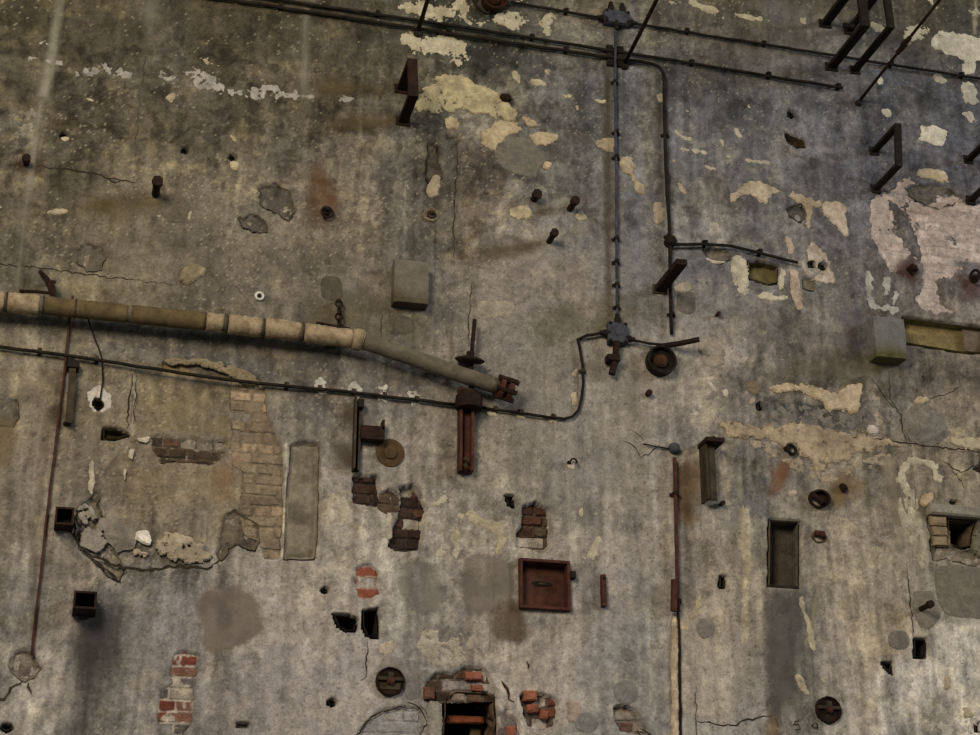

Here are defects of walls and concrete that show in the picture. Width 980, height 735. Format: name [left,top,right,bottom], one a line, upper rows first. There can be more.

peeling [400,31,469,67]
peeling [398,0,557,36]
peeling [903,24,980,123]
peeling [444,116,460,130]
peeling [522,116,558,146]
peeling [787,191,822,229]
spalling [869,177,980,314]
flaking render [123,382,283,563]
spalling [75,493,123,582]
flaking render [158,652,198,735]
flaking render [359,669,495,735]
crack [695,686,772,735]